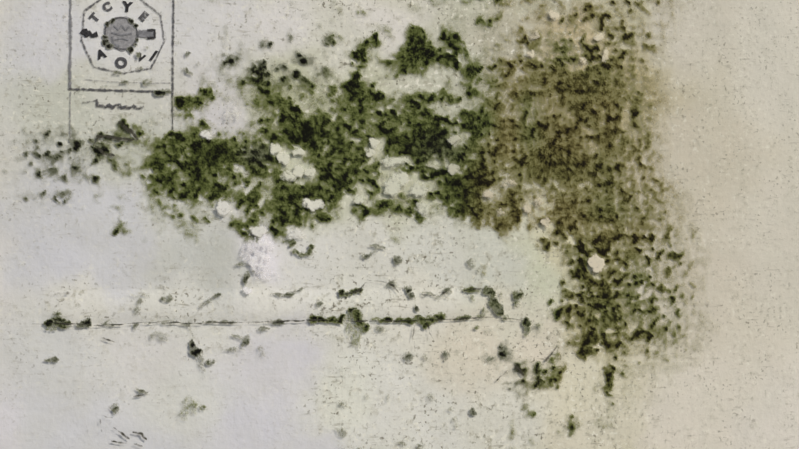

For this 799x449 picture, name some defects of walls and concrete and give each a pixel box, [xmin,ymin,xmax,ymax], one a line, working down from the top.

leakage [23,23,471,257]
peeling [270,143,316,181]
peeling [366,138,380,157]
peeling [303,198,324,211]
peeling [382,155,430,217]
peeling [588,254,605,273]
crack [339,280,398,295]
leakage [44,312,92,331]
crack [50,317,479,342]
leakage [309,280,509,345]
leakage [537,237,696,405]
leakage [486,343,567,393]